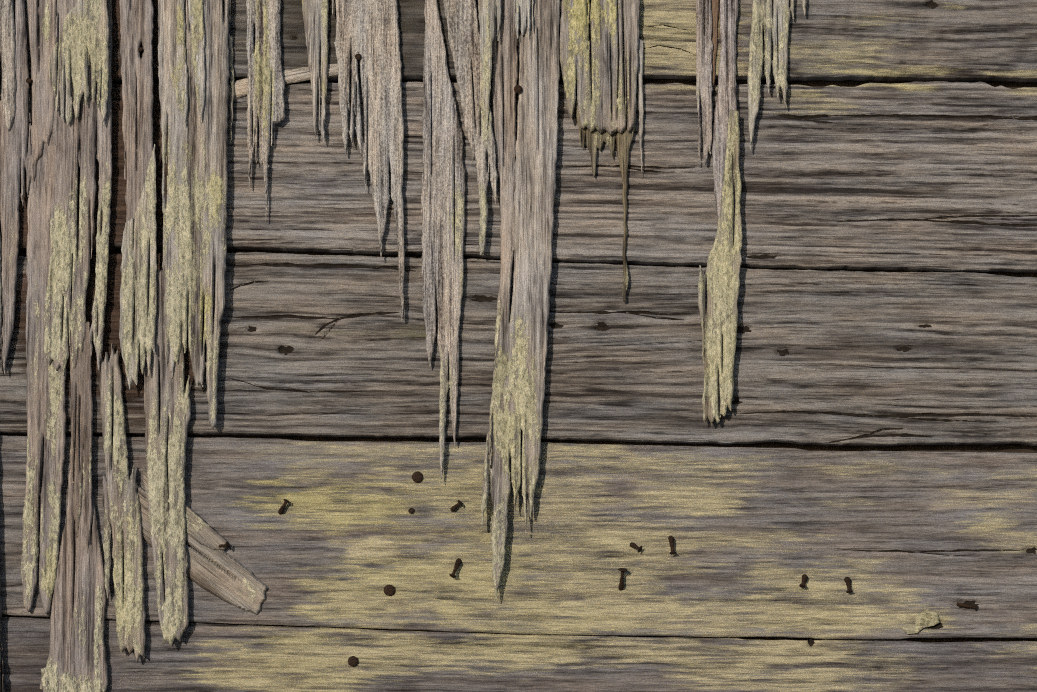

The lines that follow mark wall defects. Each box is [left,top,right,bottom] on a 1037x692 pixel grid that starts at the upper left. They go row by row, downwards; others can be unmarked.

crack [841,548,1020,556]